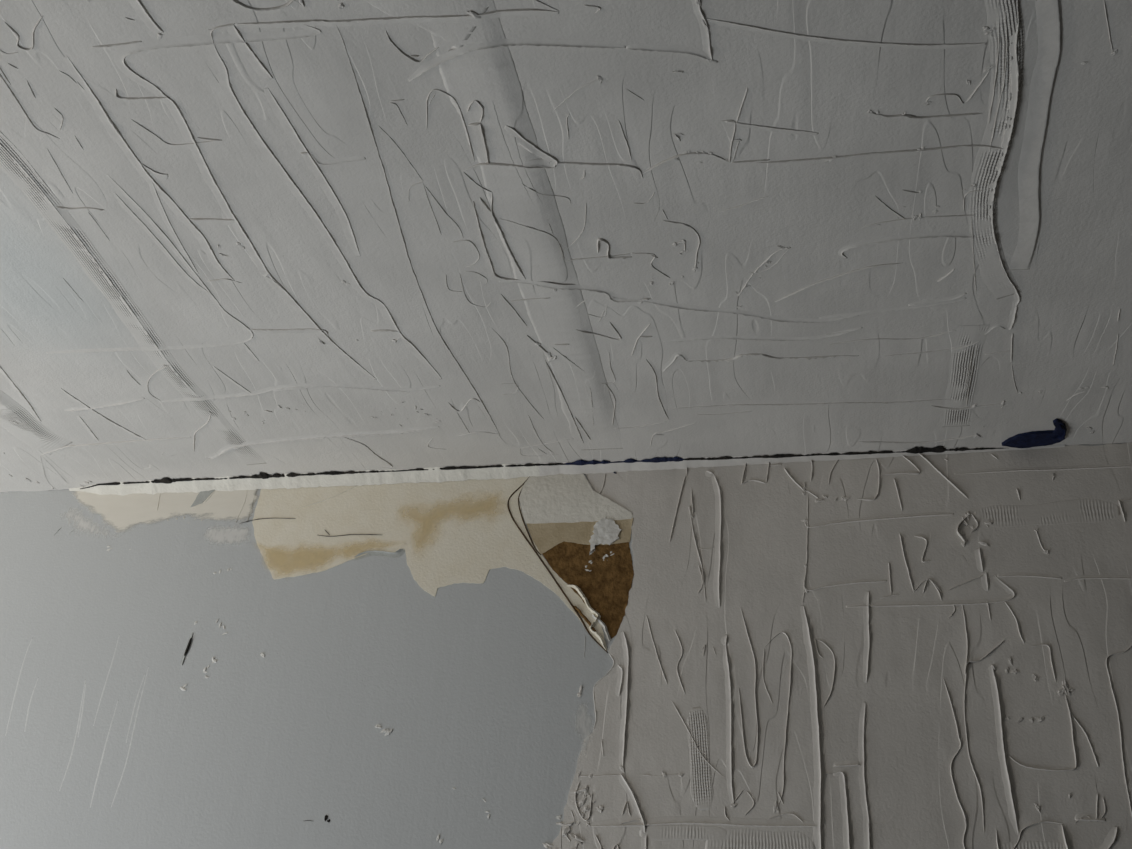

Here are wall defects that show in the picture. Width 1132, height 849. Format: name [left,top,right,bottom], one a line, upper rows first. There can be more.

spalling [181,621,197,666]
peeling [75,477,607,650]